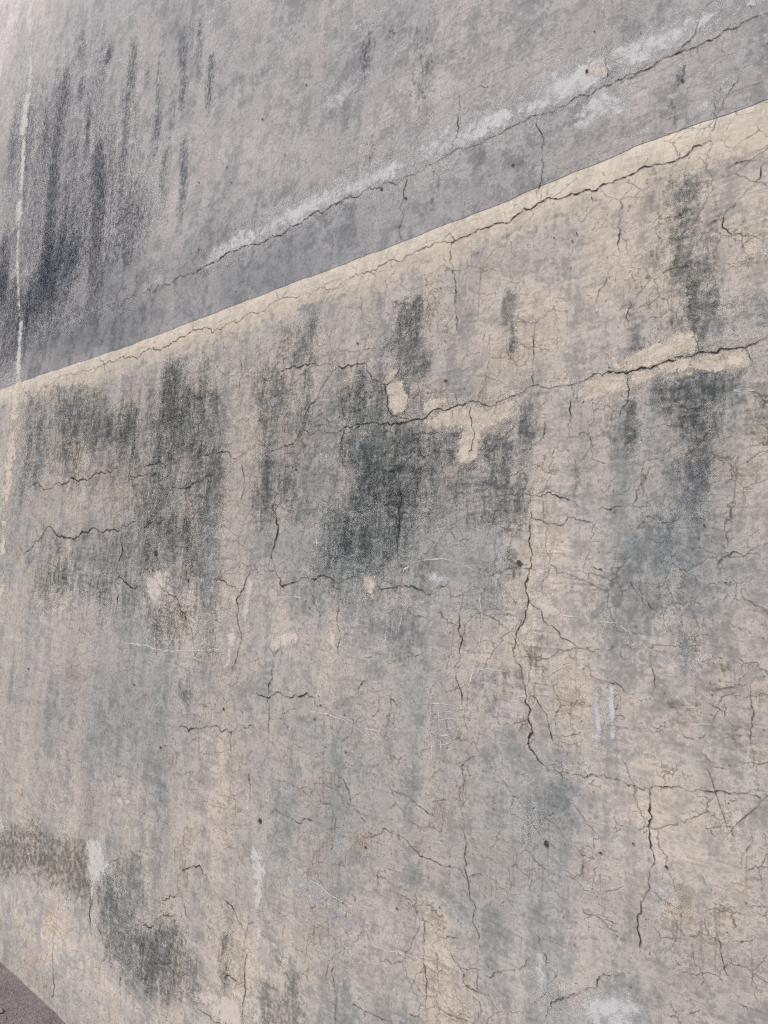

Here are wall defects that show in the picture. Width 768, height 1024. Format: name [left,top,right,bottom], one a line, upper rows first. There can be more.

crack [27,0,766,392]
water stain [191,0,766,269]
crack [178,641,316,801]
crack [20,330,767,704]
efflorescence [426,572,449,586]
crack [509,467,766,953]
crack [144,852,207,928]
crack [197,901,253,1024]
crack [325,755,547,1023]
crack [550,972,624,1009]